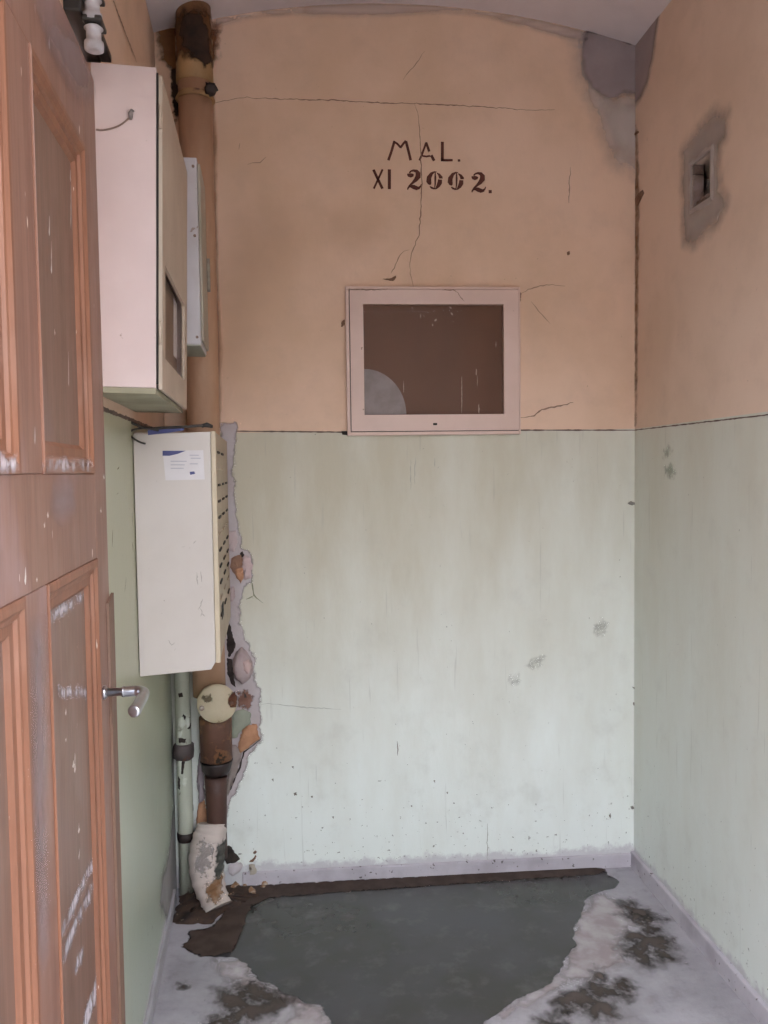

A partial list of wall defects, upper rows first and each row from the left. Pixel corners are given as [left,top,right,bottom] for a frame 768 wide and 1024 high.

rust [157,8,218,121]
crack [216,51,536,291]
damp [488,13,658,390]
crack [521,402,573,418]
spalling [220,422,261,812]
damp [499,895,676,1024]